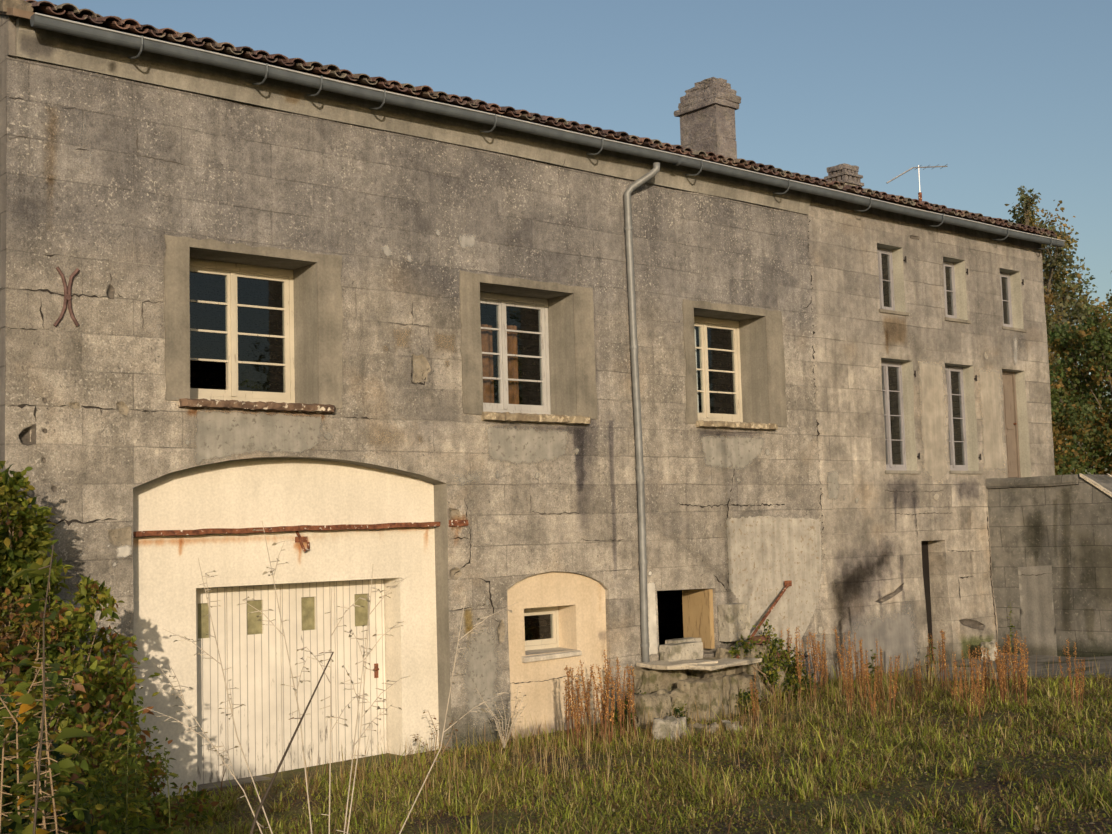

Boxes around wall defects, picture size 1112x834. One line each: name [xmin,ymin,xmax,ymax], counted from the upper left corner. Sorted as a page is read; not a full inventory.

crack [0,274,163,331]
spalling [19,424,36,446]
crack [679,468,785,518]
crack [46,518,117,526]
crack [452,498,498,622]